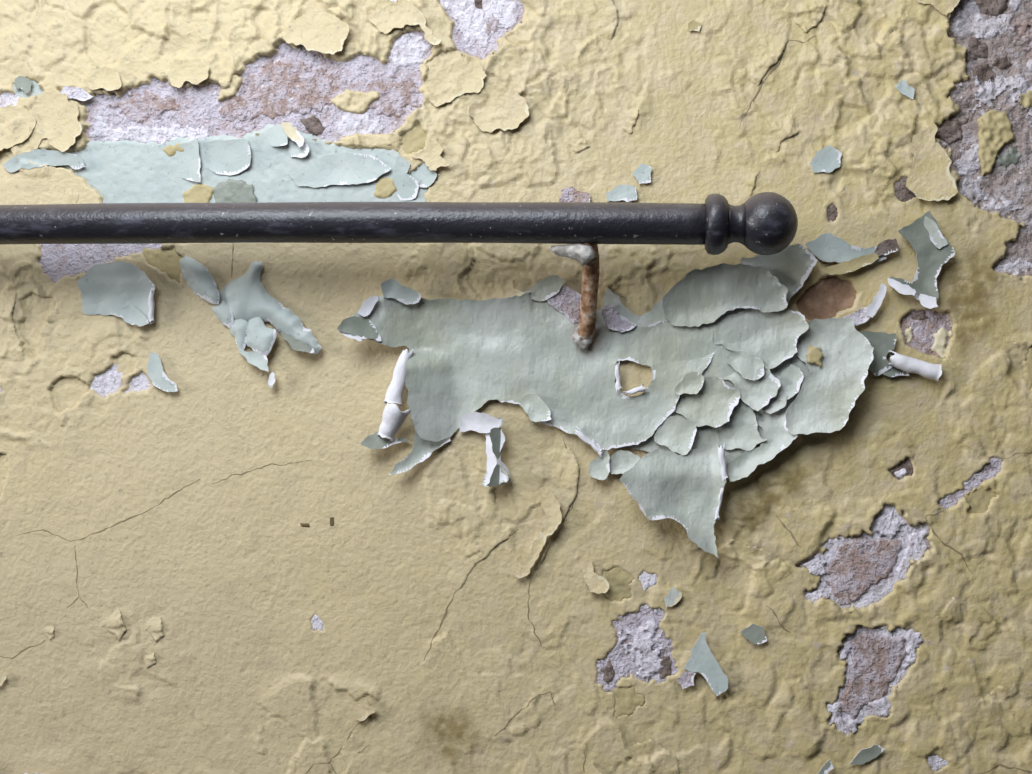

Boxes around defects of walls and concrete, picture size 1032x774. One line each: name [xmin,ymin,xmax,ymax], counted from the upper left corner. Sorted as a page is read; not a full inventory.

peeling [0,0,529,204]
peeling [38,243,322,388]
peeling [337,0,1032,559]
peeling [515,487,562,578]
peeling [796,504,931,609]
peeling [581,559,728,718]
peeling [826,625,923,735]
peeling [818,759,834,774]